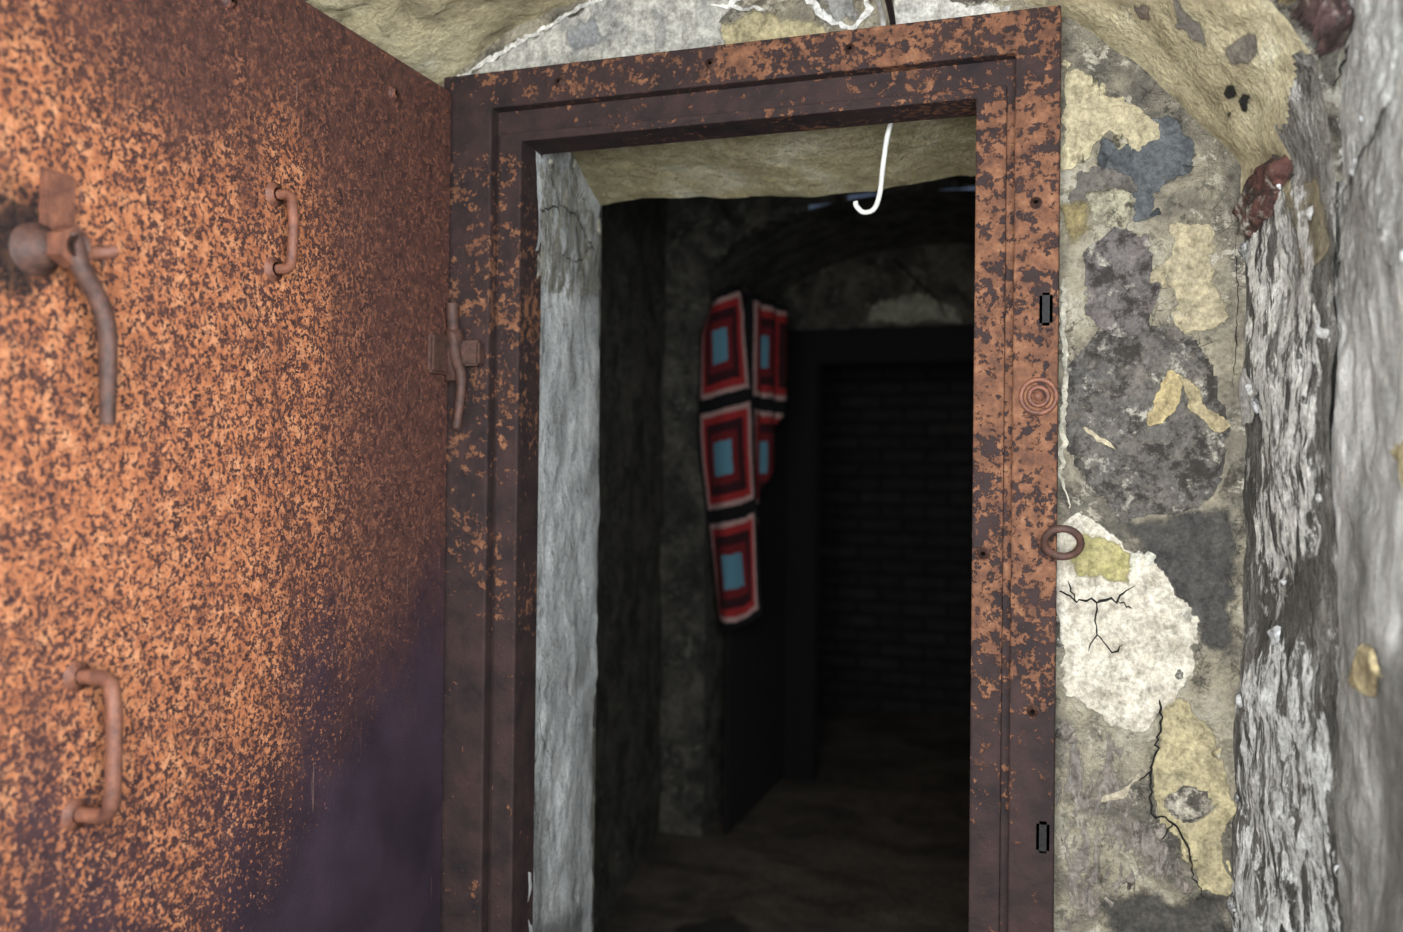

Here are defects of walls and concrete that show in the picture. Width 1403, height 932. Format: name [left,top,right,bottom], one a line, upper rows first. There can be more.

spalling [1134,4,1150,20]
spalling [1173,0,1206,46]
spalling [1226,34,1258,65]
peeling [1275,0,1403,302]
peeling [537,157,601,304]
flaking render [863,293,962,324]
spalling [1055,60,1340,932]
spalling [1348,643,1383,698]